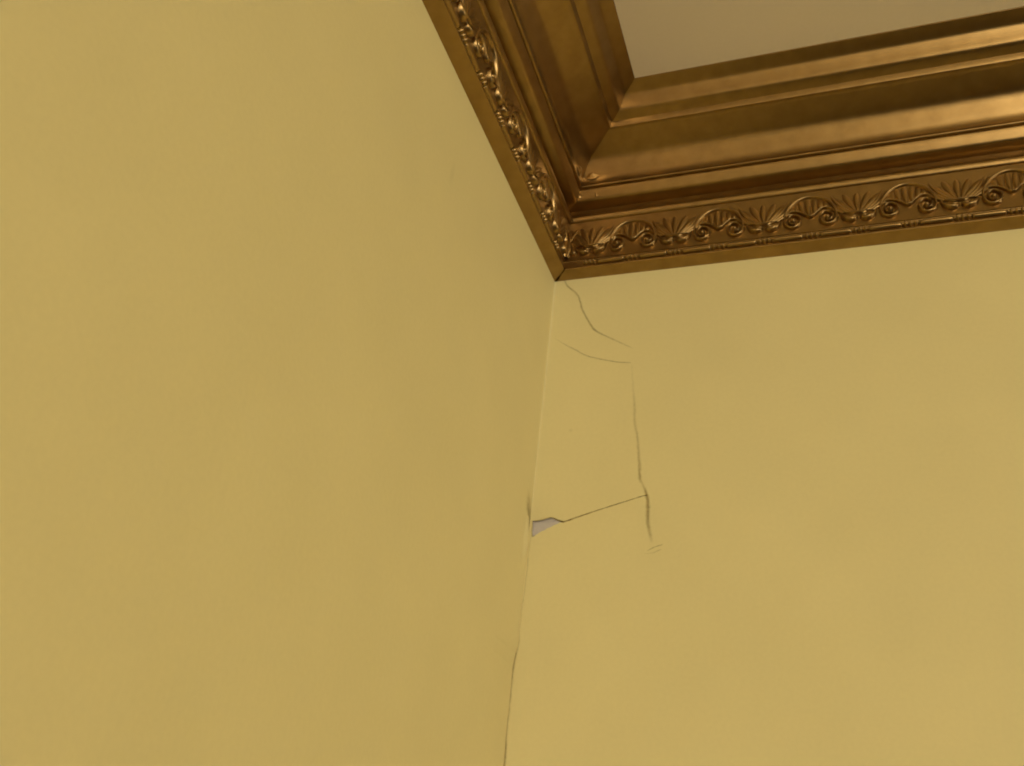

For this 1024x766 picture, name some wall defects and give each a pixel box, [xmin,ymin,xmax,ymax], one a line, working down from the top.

spalling [532,515,563,536]